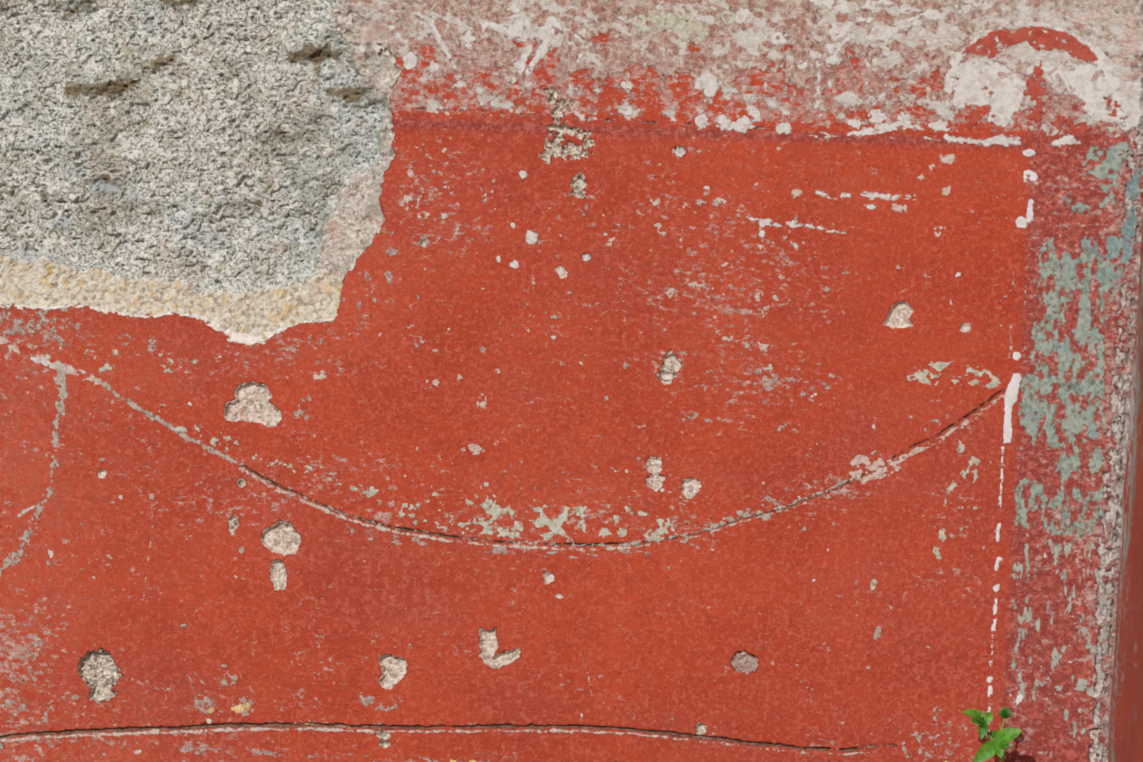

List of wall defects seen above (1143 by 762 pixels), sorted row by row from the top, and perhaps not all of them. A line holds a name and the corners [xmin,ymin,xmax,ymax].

peeling [462,0,583,84]
spalling [539,87,595,164]
peeling [695,106,762,133]
flaking render [0,0,457,373]
peeling [797,0,1143,740]
spalling [175,381,379,497]
crack [0,336,1005,577]
spalling [260,520,301,590]
spalling [41,649,124,723]
spalling [359,655,407,711]
spalling [479,628,521,669]
crack [0,720,898,756]